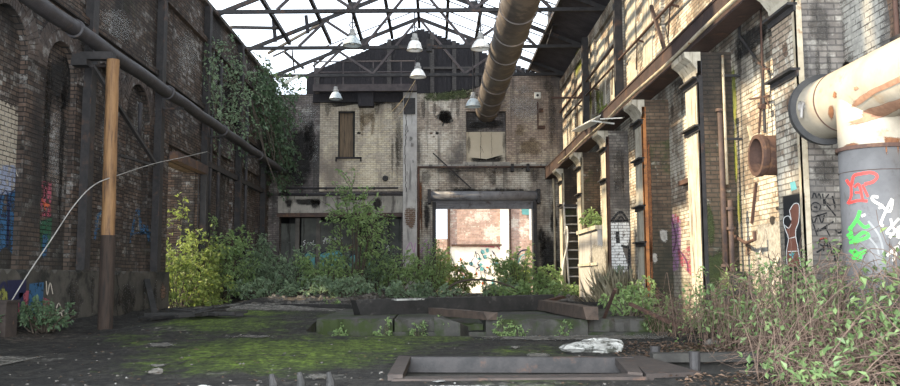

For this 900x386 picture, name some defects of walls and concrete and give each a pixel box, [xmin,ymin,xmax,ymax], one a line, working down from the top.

spalling [430,110,453,137]
corrosion [850,76,900,125]